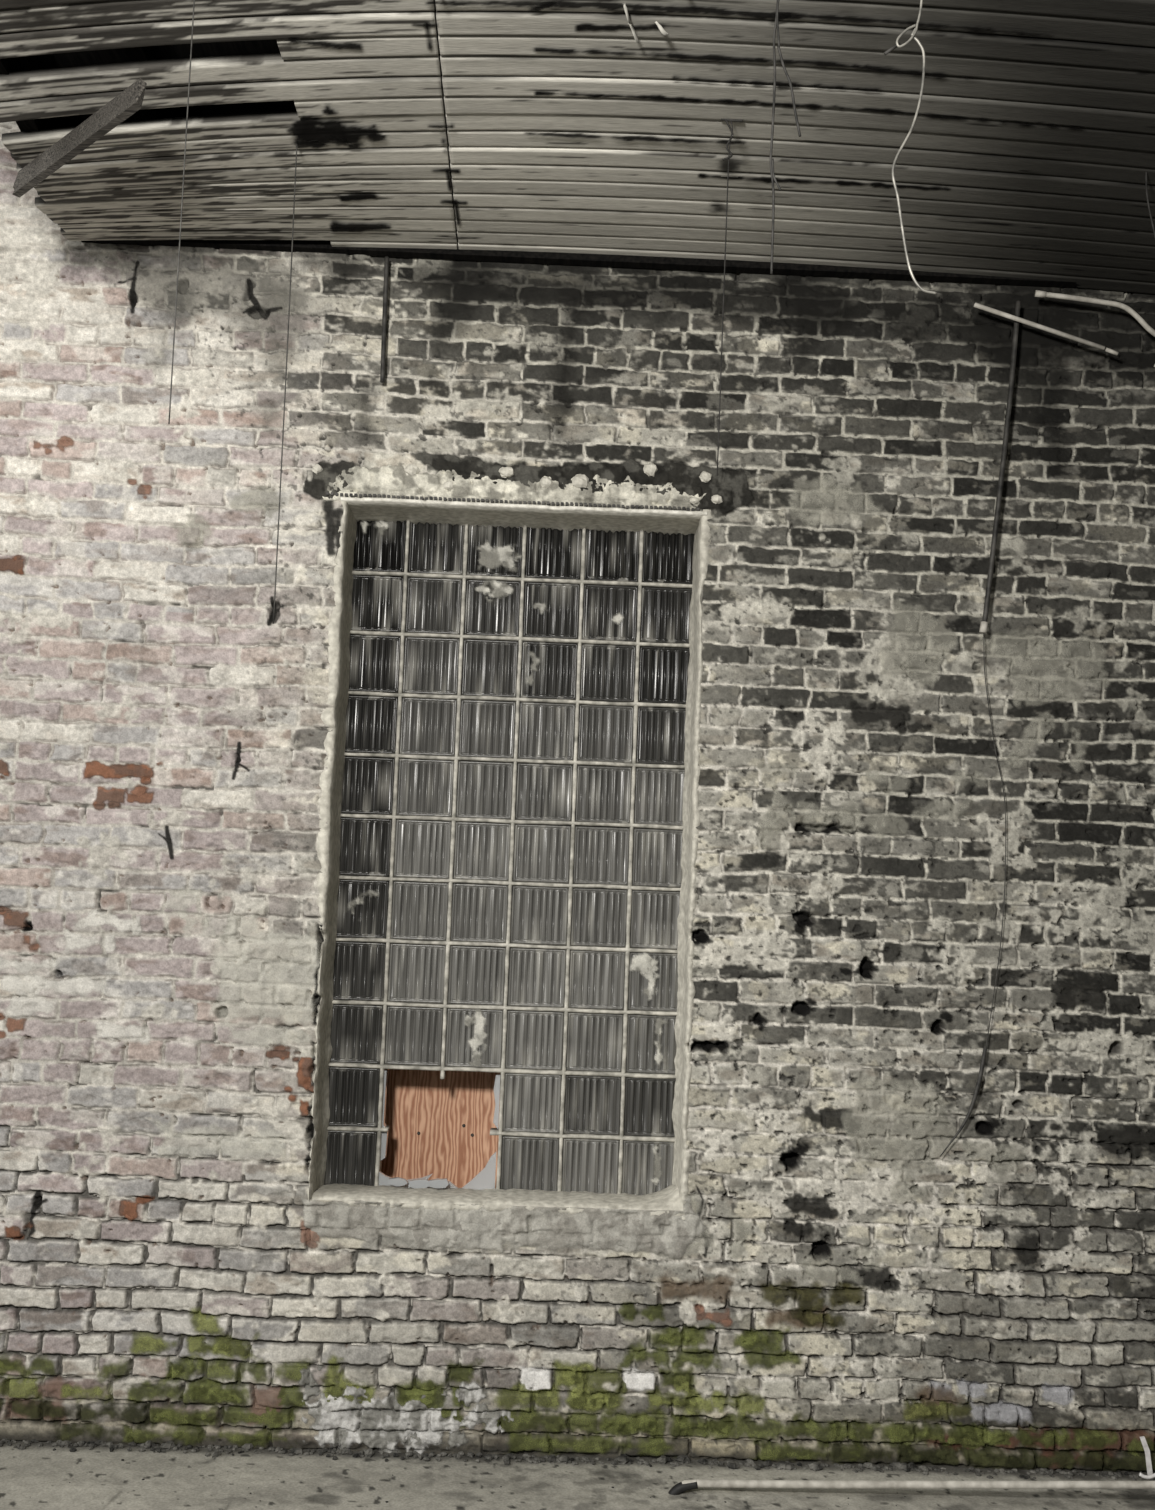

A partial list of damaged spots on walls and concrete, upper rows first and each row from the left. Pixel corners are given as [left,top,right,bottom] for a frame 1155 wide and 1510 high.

leakage [792,275,842,333]
leakage [986,284,1069,435]
spalling [303,460,355,499]
spalling [412,451,754,518]
leakage [899,722,931,734]
spalling [793,911,812,935]
spalling [840,960,878,979]
spalling [780,1144,809,1167]
spalling [809,1240,831,1260]
leakage [520,1367,551,1391]
leakage [623,1367,655,1390]
leakage [929,1380,1030,1448]